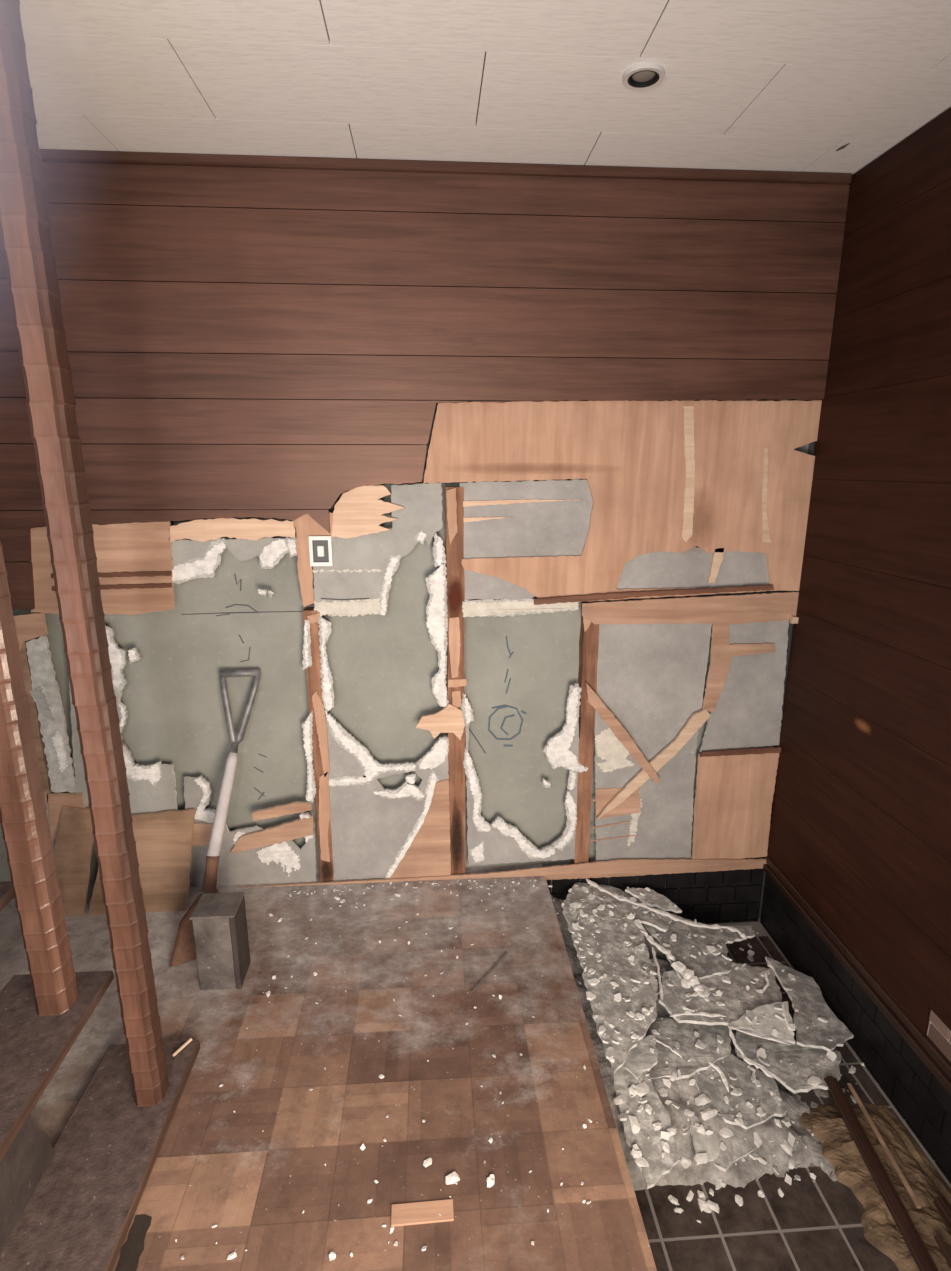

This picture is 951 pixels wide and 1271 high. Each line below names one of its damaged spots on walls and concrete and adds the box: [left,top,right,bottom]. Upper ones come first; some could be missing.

peeling [172,538,227,584]
peeling [259,537,297,569]
peeling [413,530,579,726]
peeling [30,684,69,773]
peeling [105,625,163,786]
peeling [300,554,449,879]
peeling [194,775,245,844]
peeling [256,841,301,877]
peeling [463,684,634,864]
peeling [627,799,643,846]